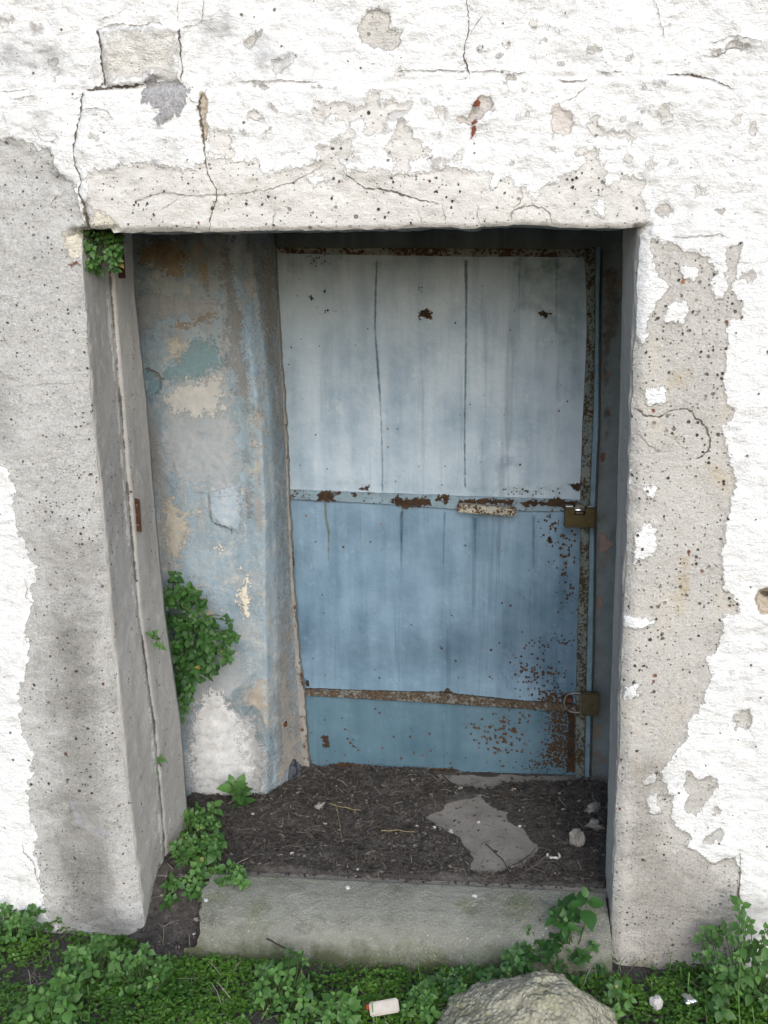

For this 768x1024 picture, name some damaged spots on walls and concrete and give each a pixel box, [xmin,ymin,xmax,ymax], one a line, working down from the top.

spalling [357,6,401,51]
crack [391,1,528,75]
crack [51,91,116,229]
crack [134,93,322,231]
crack [346,175,446,223]
rust [418,308,433,320]
crack [633,407,711,459]
peeling [0,89,673,939]
rust [316,483,580,613]
peeling [611,236,757,974]
spalling [755,587,768,615]